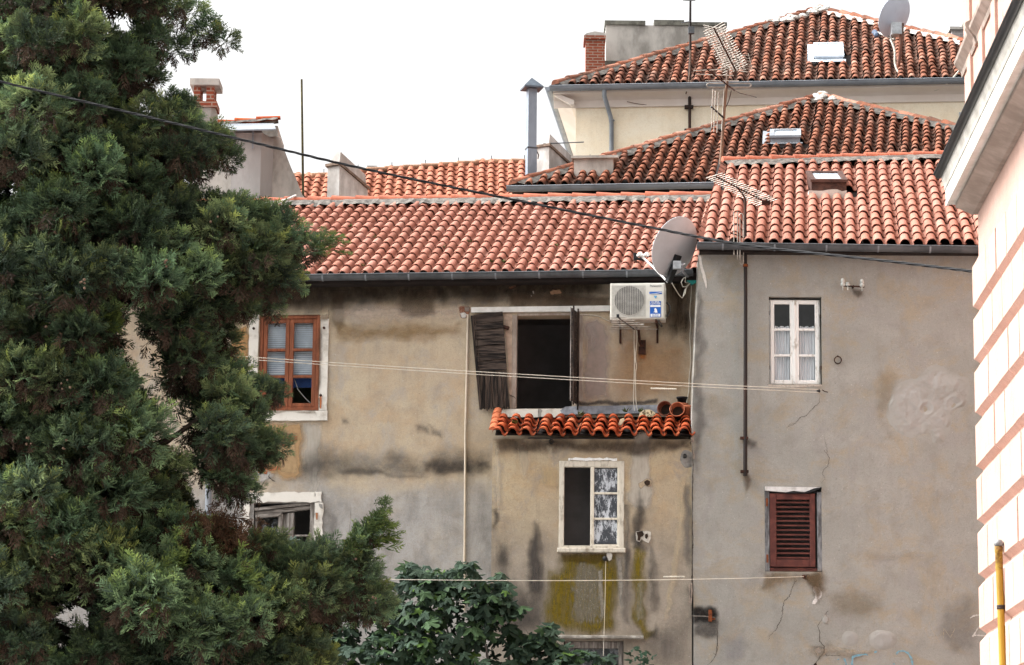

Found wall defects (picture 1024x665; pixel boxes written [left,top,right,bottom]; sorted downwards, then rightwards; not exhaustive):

flaking render [253,424,302,482]
leakage [434,433,686,598]
leakage [504,529,543,628]